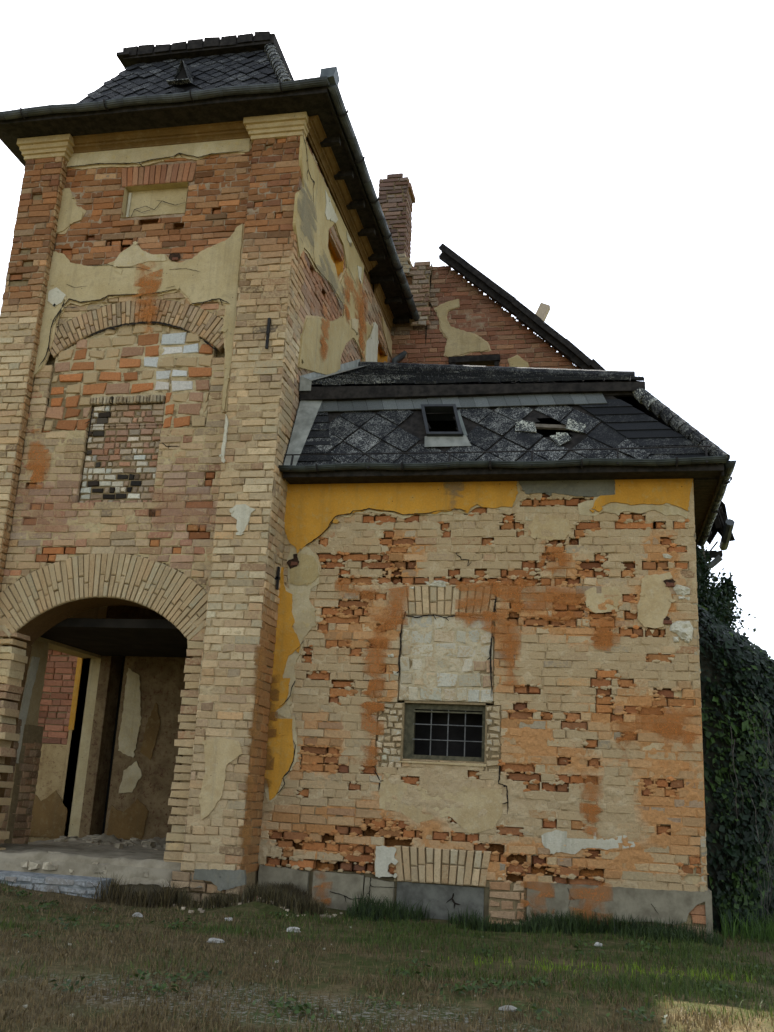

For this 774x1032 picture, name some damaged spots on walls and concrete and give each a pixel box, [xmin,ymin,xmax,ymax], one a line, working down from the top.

crack [68,150,243,168]
peeling [66,138,252,170]
peeling [56,188,87,234]
spalling [5,248,33,284]
peeling [275,136,392,375]
peeling [434,299,491,358]
peeling [33,223,245,486]
peeling [508,355,529,367]
spalling [172,524,210,554]
peeling [230,504,255,536]
peeling [264,479,699,802]
spalling [265,816,635,886]